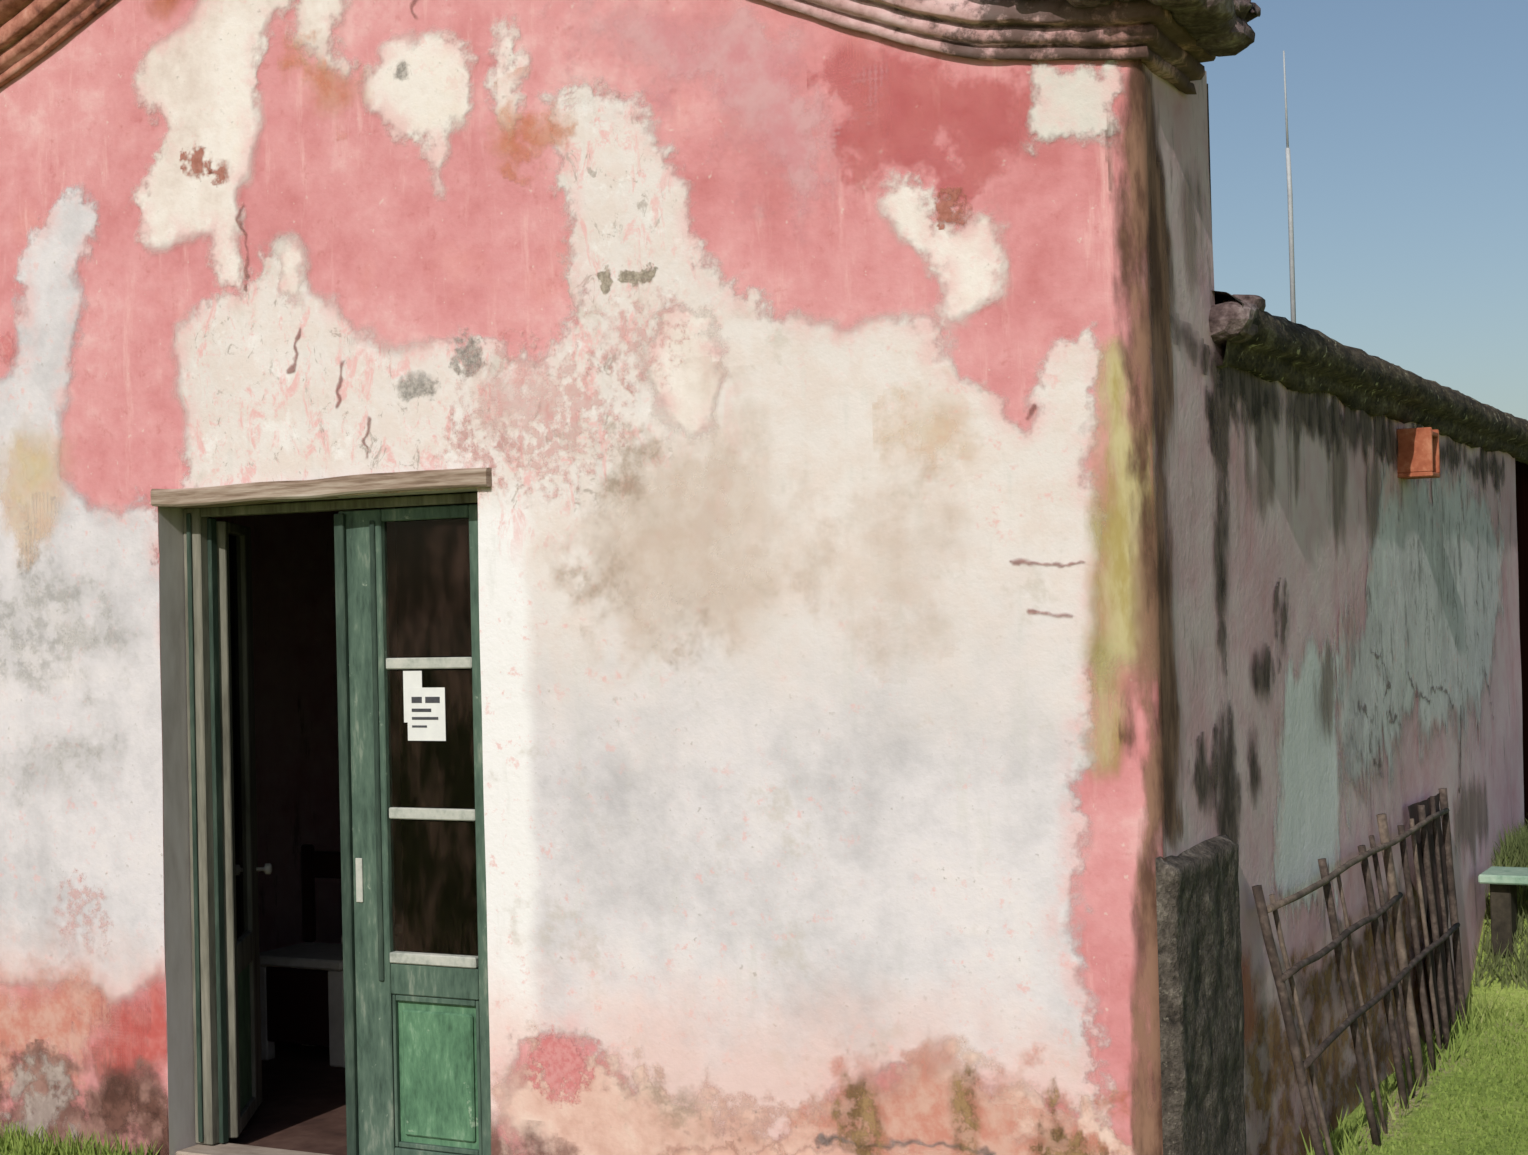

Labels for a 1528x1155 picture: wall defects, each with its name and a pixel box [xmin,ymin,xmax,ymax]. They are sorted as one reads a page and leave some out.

water stain [1205,346,1398,674]
water stain [1439,439,1505,491]
flaking render [0,187,167,1086]
flaking render [134,0,1136,1155]
water stain [1117,61,1261,1155]
water stain [1253,577,1287,695]
water stain [1321,645,1333,732]
flaking render [1336,461,1504,794]
water stain [1455,780,1488,864]
water stain [0,1040,168,1155]
water stain [832,1083,882,1155]
water stain [953,1069,978,1151]